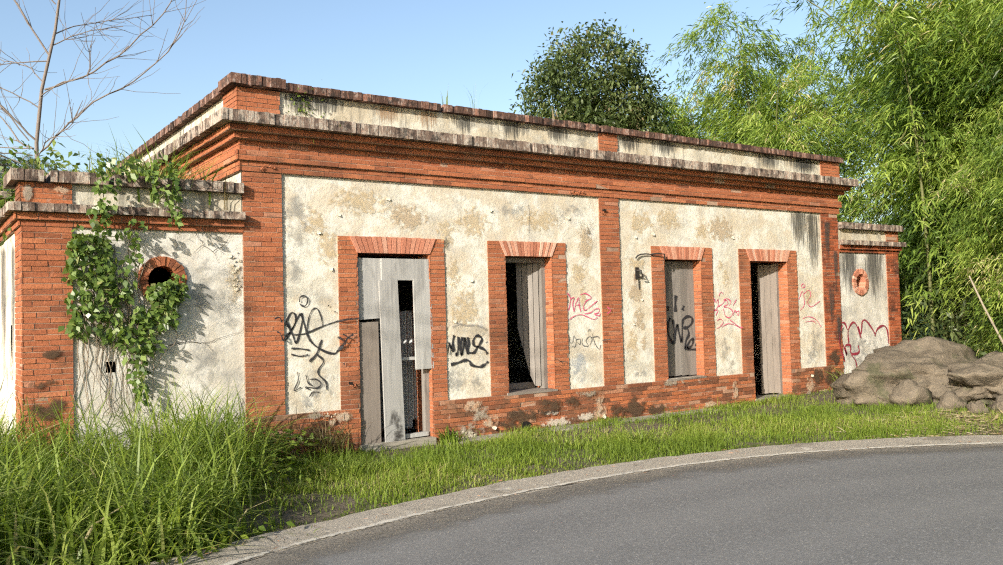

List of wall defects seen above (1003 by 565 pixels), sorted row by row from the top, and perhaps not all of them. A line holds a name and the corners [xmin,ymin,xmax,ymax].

leakage [285,94,343,113]
leakage [504,121,525,139]
leakage [547,127,567,139]
leakage [622,137,639,151]
leakage [654,141,674,153]
leakage [789,158,815,173]
leakage [1,248,14,336]
flaking render [576,391,606,418]
flaking render [456,401,498,438]